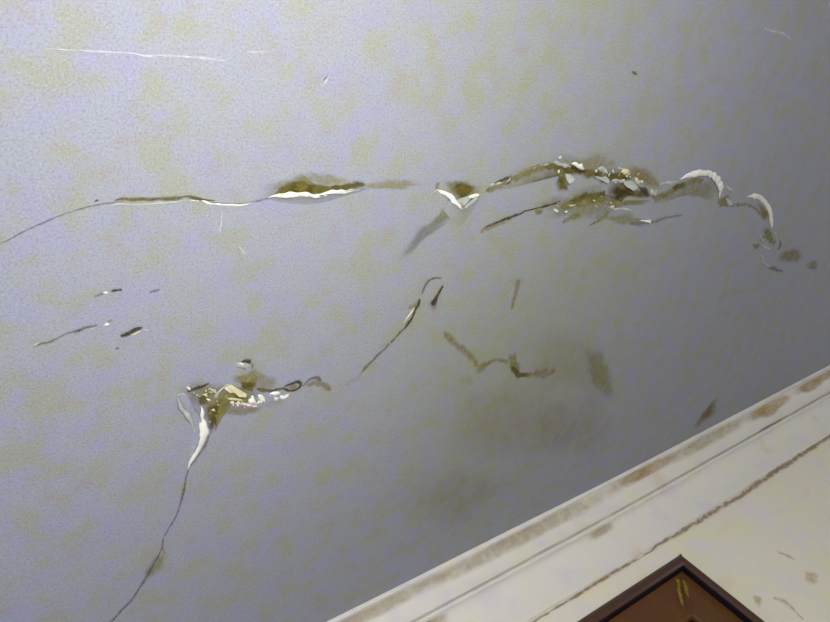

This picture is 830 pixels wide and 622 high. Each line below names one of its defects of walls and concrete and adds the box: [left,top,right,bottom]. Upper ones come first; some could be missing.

crack [78,175,406,210]
peeling [411,156,783,272]
crack [33,323,109,346]
crack [362,277,443,372]
flaking render [177,360,331,470]
crack [112,470,189,621]